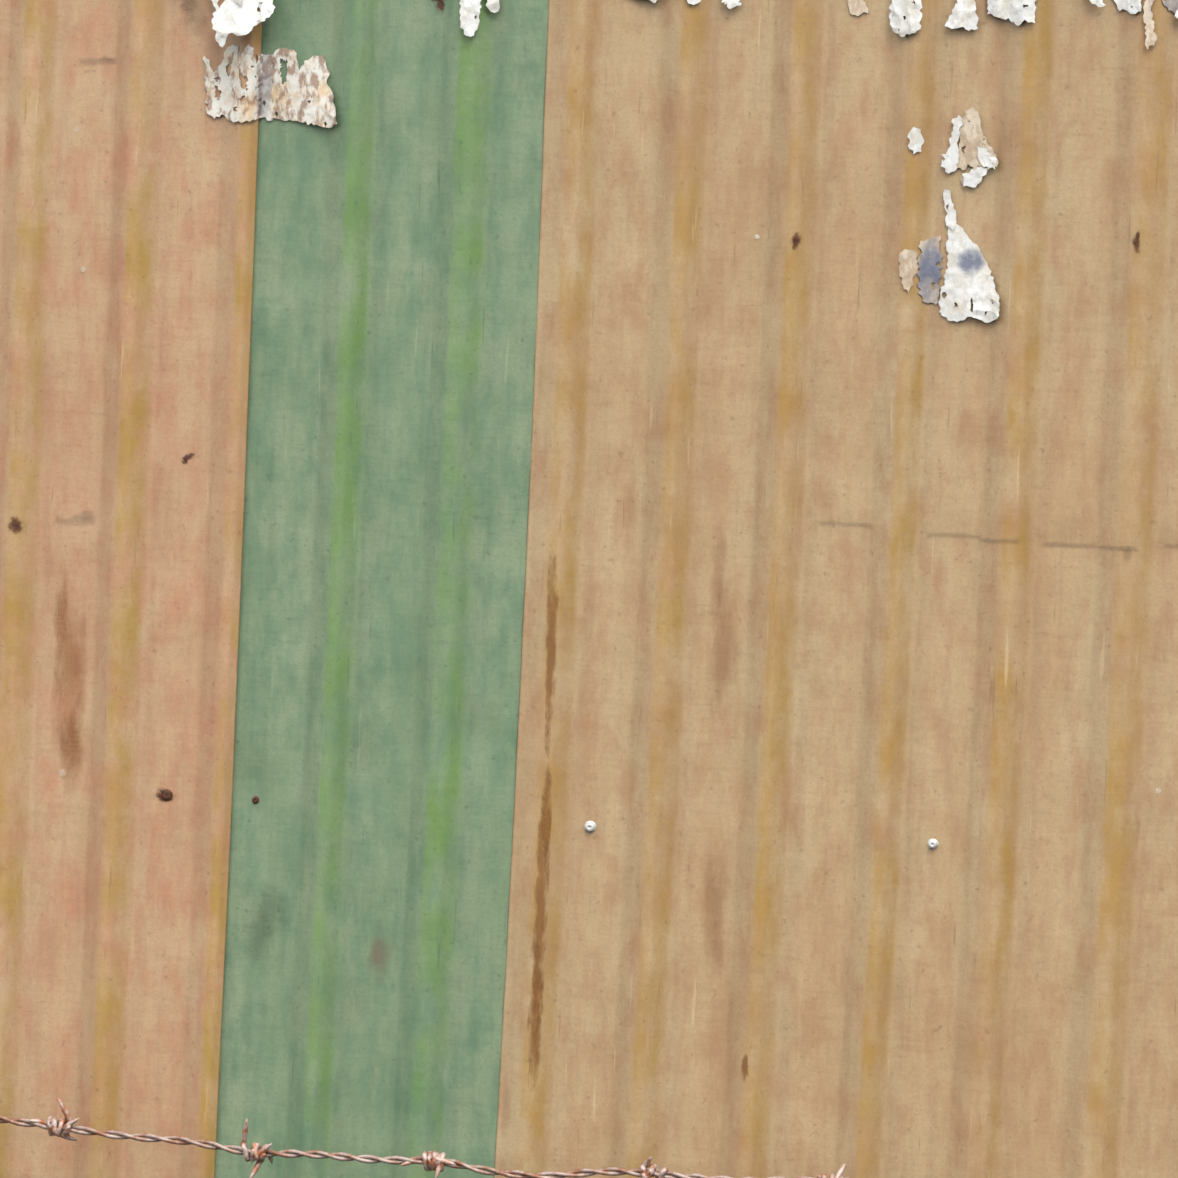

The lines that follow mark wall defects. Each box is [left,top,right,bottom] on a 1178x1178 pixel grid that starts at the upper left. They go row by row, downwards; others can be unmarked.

peeling [459,0,500,37]
peeling [722,0,741,9]
peeling [848,0,868,16]
peeling [889,0,923,37]
peeling [945,0,1036,31]
peeling [1090,0,1178,49]
peeling [203,0,337,128]
peeling [907,127,924,154]
peeling [941,107,998,188]
peeling [898,189,1000,323]